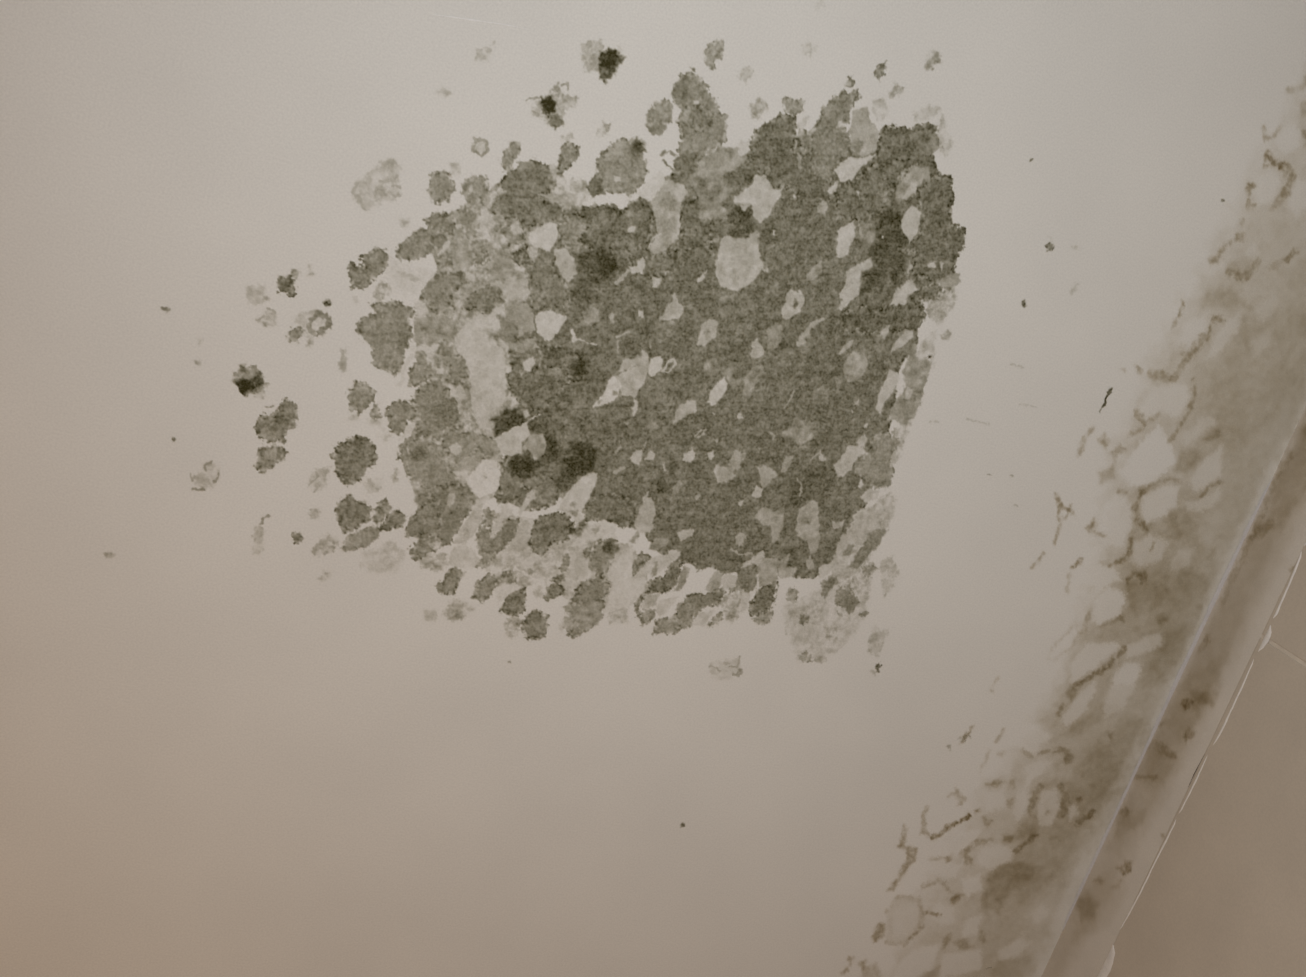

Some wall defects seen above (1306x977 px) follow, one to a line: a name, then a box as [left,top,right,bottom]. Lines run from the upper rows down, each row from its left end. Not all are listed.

mould [598,48,623,82]
water stain [278,275,297,297]
mould [348,245,410,284]
water stain [386,69,966,625]
mould [235,366,264,396]
water stain [256,400,290,473]
mould [331,435,474,561]
mould [499,587,543,640]